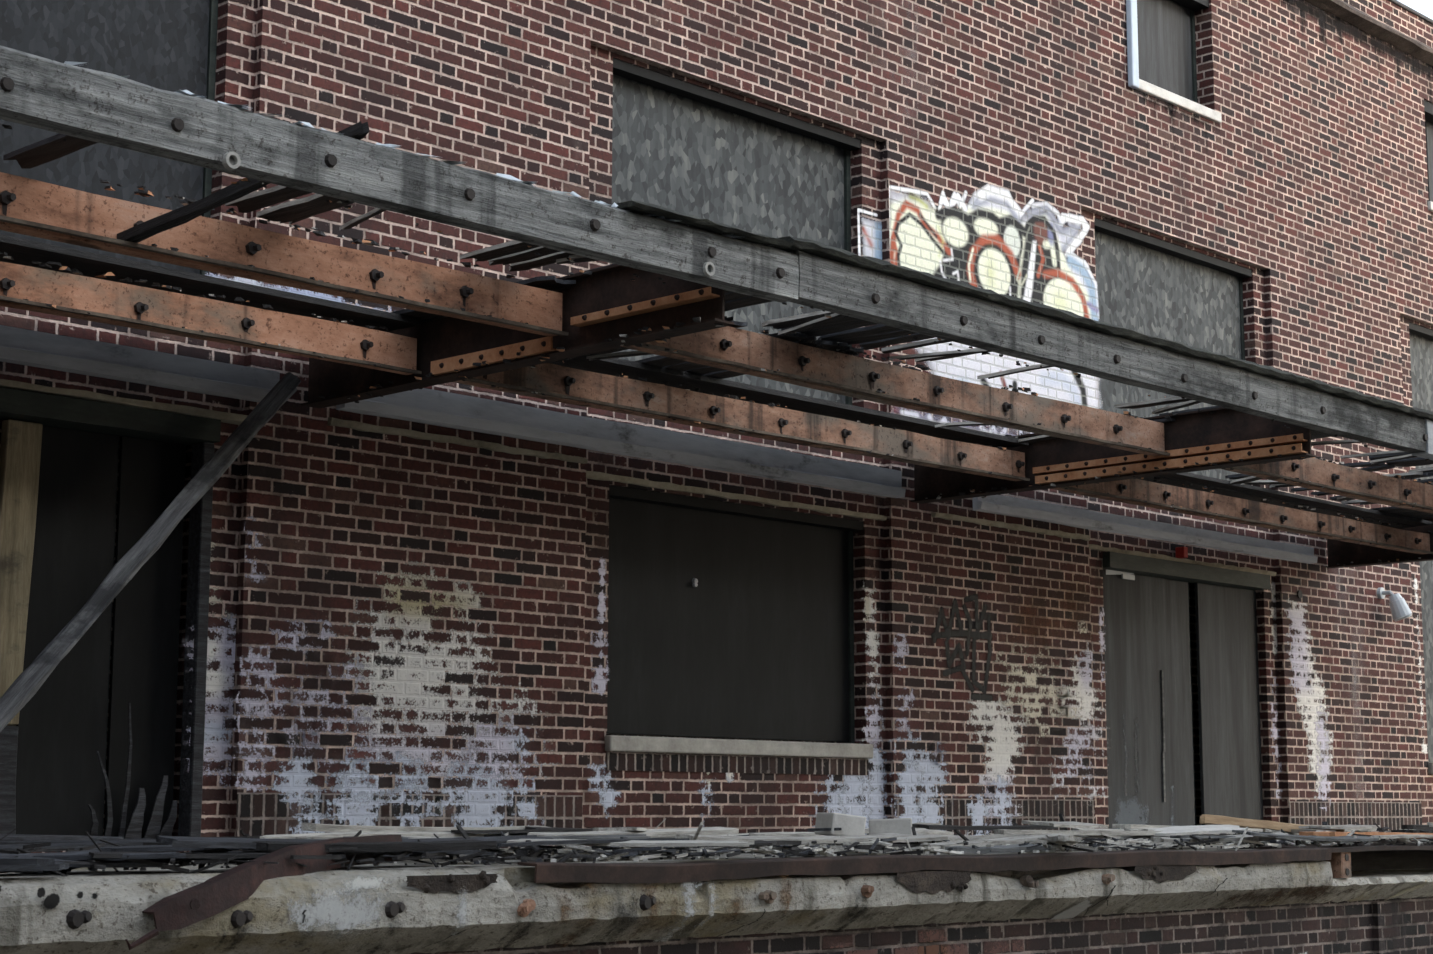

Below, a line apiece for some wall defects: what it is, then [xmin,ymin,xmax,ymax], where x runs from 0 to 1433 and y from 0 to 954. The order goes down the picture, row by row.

spalling [406,870,498,894]
spalling [897,870,972,894]